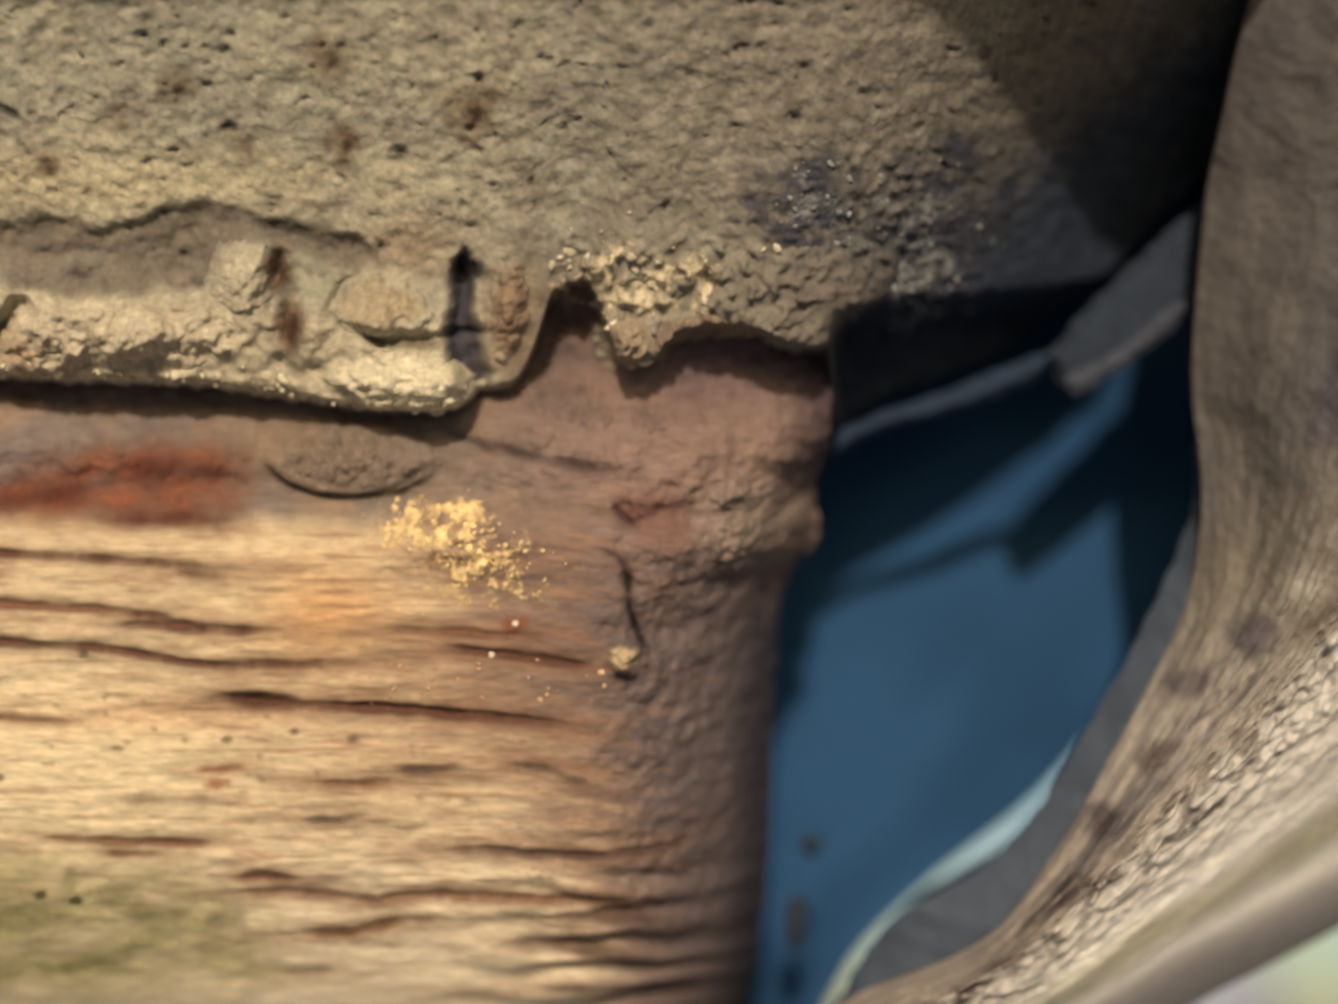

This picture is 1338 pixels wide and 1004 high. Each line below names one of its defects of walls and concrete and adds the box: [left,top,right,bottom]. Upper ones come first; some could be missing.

spalling [0,206,374,294]
spalling [457,254,482,276]
efflorescence [548,230,722,343]
peeling [650,227,900,365]
damp [743,136,1012,333]
corrosion [0,447,230,524]
damp [1090,803,1118,836]